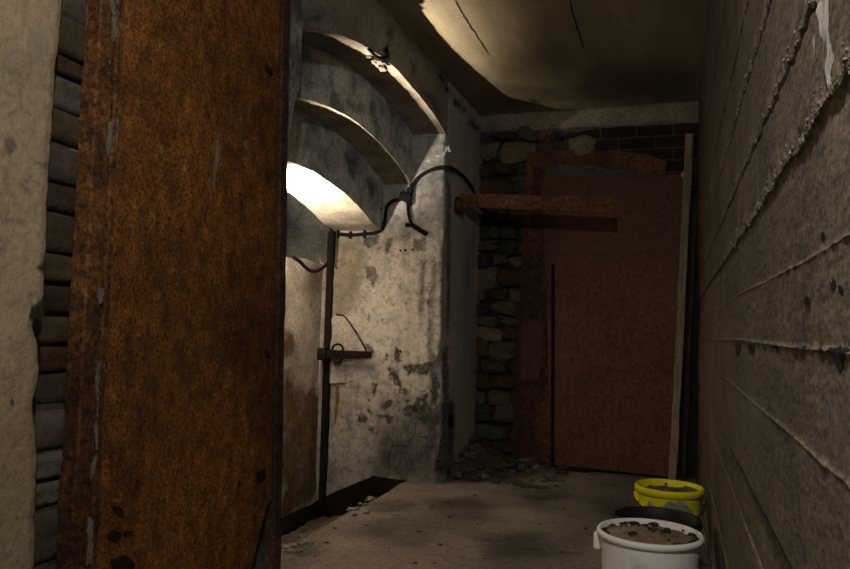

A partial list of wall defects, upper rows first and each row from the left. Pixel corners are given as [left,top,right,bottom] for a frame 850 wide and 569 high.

crack [455,1,490,56]
spalling [720,26,850,260]
flaking render [358,346,454,471]
corrosion [110,555,135,569]